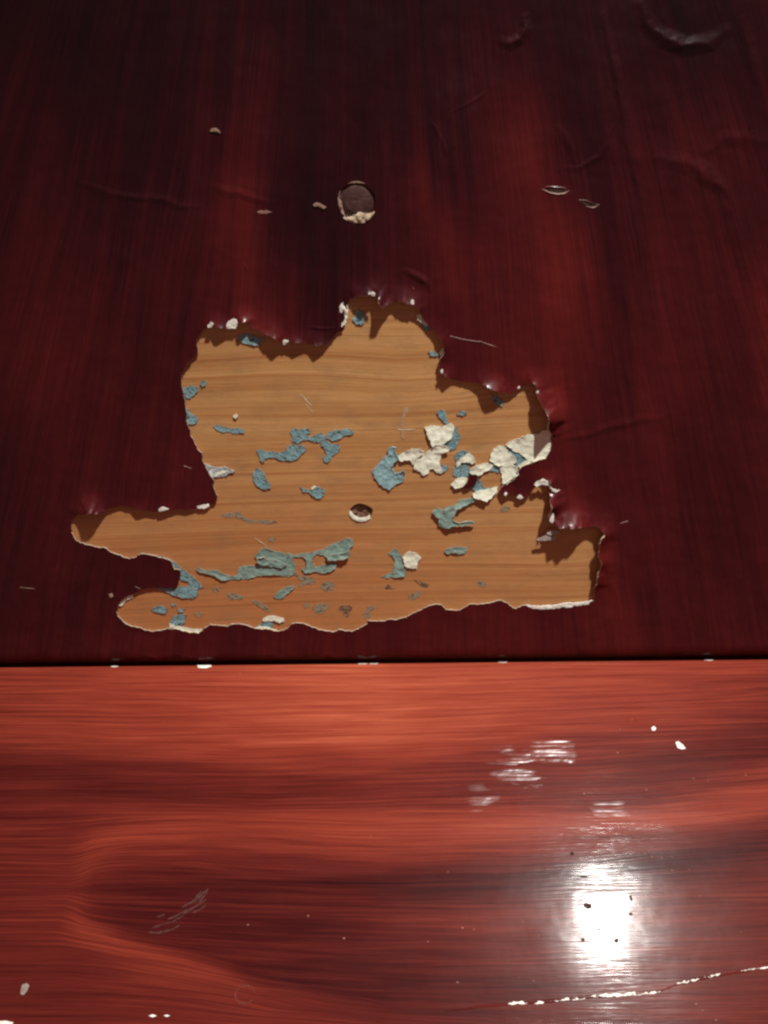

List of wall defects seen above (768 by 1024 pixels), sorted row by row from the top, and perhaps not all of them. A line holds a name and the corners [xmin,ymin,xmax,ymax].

peeling [40,258,632,668]